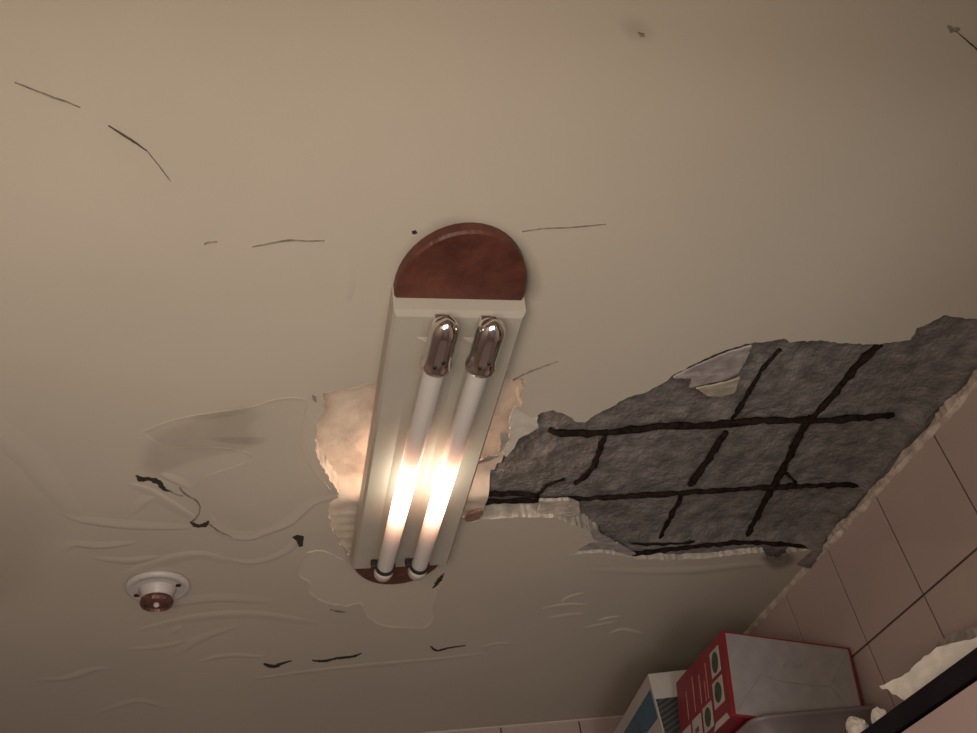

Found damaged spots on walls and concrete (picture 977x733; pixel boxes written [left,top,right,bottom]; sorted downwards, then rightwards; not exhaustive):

crack [15,82,80,108]
crack [108,125,171,182]
crack [252,239,324,248]
crack [522,224,606,232]
spalling [462,315,977,569]
crack [135,475,232,537]
flaking render [292,383,444,629]
crack [263,653,362,668]